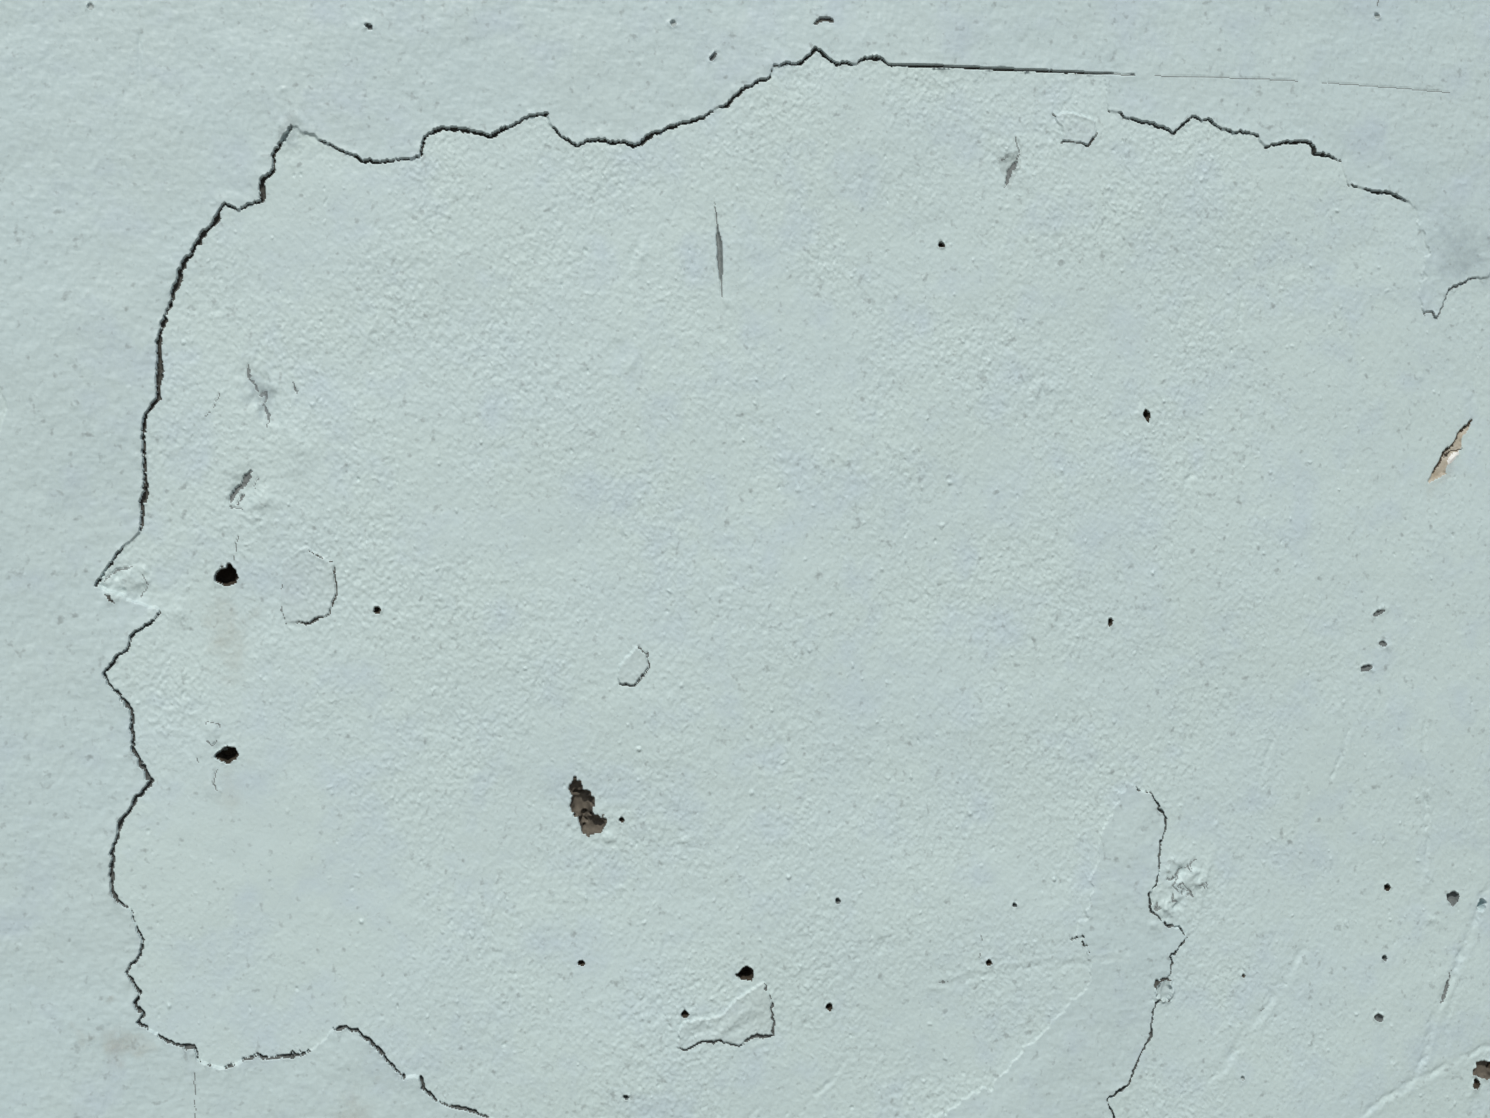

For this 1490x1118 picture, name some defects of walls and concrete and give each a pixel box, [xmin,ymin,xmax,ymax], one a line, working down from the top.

crack [891,65,1450,93]
peeling [250,143,283,205]
peeling [450,126,509,139]
peeling [597,132,660,149]
peeling [165,208,222,315]
peeling [136,316,168,531]
crack [204,364,299,428]
peeling [280,547,338,626]
peeling [102,642,155,840]
crack [197,721,221,791]
peeling [677,983,775,1051]
crack [1440,970,1452,1003]